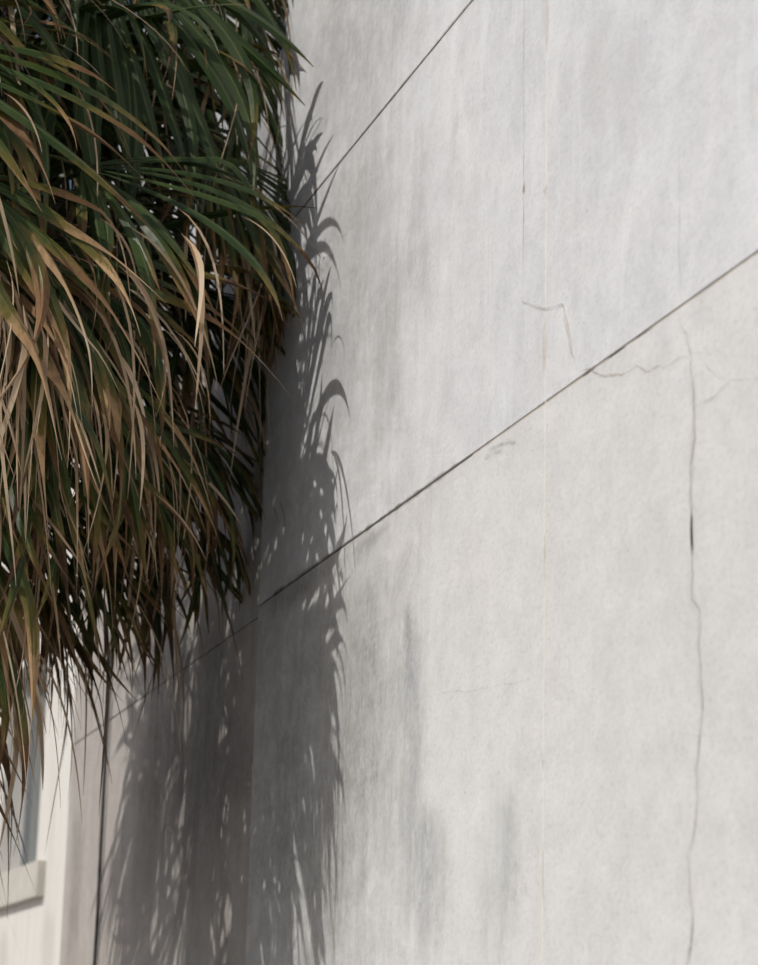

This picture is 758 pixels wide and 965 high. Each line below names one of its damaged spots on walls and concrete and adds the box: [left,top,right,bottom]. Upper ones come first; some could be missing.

crack [687,515,695,553]